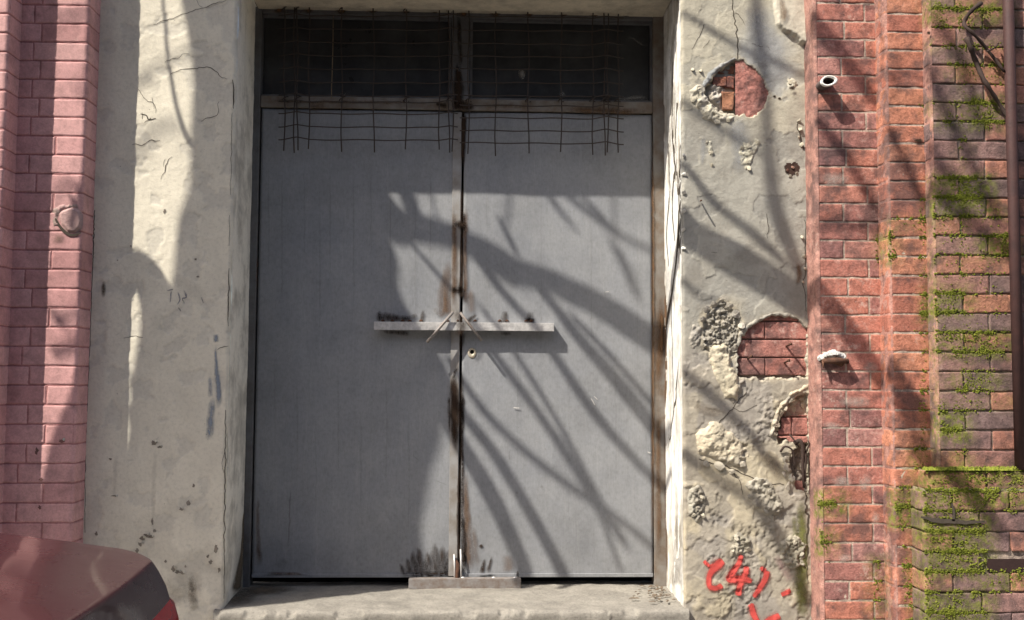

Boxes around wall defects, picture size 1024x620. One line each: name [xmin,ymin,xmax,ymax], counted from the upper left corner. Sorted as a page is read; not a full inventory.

crack [732,0,770,59]
spalling [689,57,798,125]
crack [132,89,170,177]
crack [167,53,234,236]
peeling [738,139,760,170]
spalling [784,162,800,178]
corrosion [442,219,471,313]
crack [218,271,230,349]
spalling [687,297,810,522]